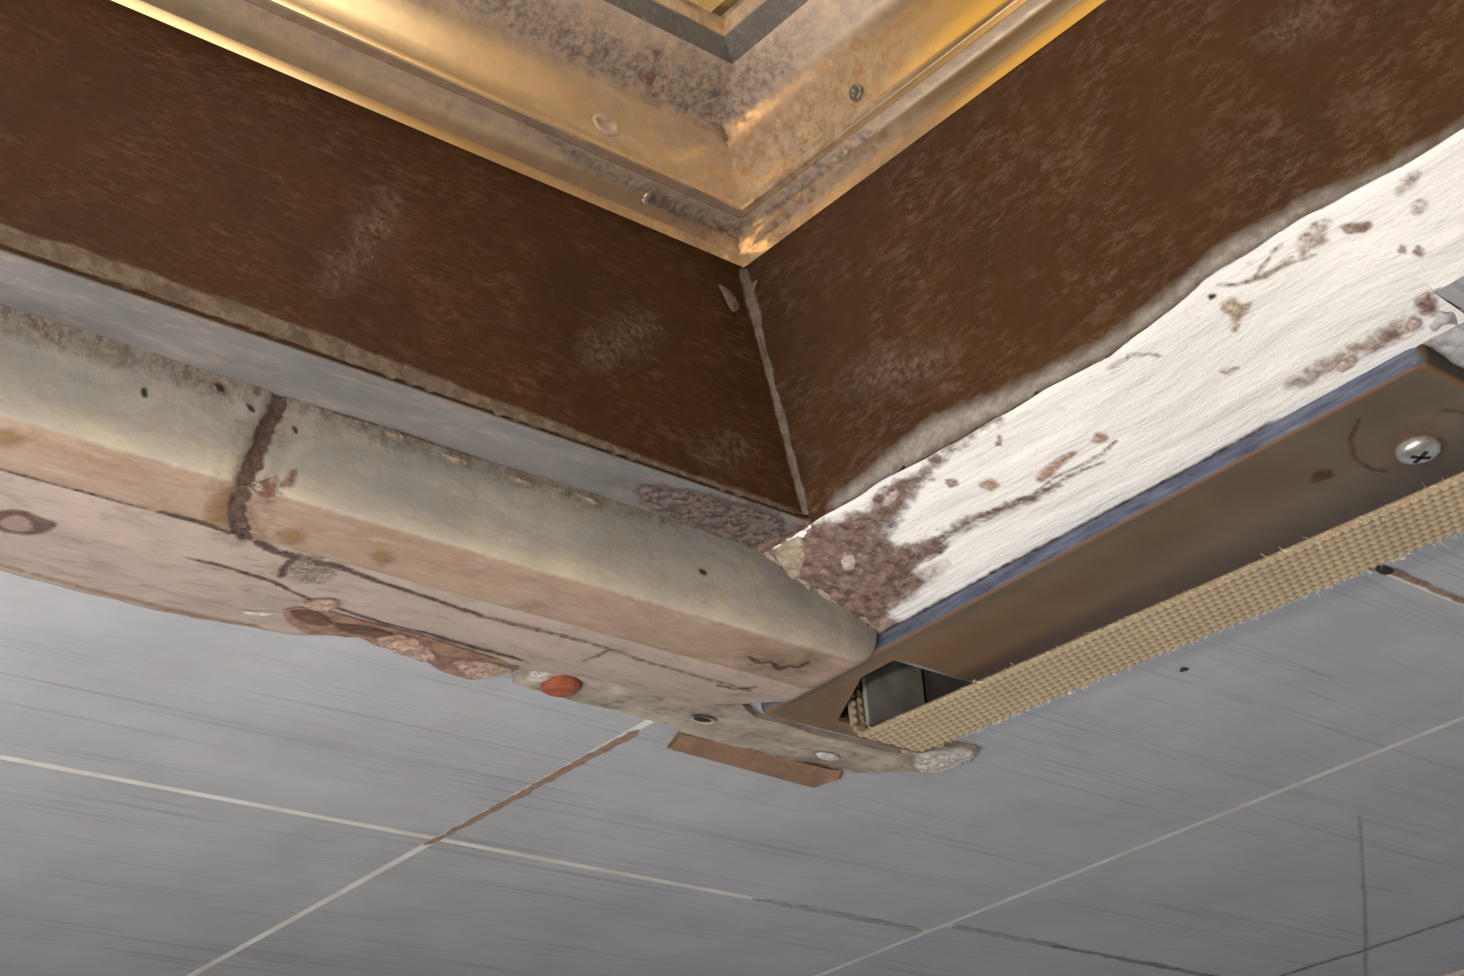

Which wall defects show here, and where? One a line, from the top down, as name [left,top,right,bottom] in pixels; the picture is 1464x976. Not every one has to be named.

spalling [1343,222,1371,234]
spalling [1208,295,1250,332]
flaking render [1289,294,1464,387]
crack [0,393,808,690]
spalling [247,557,518,680]